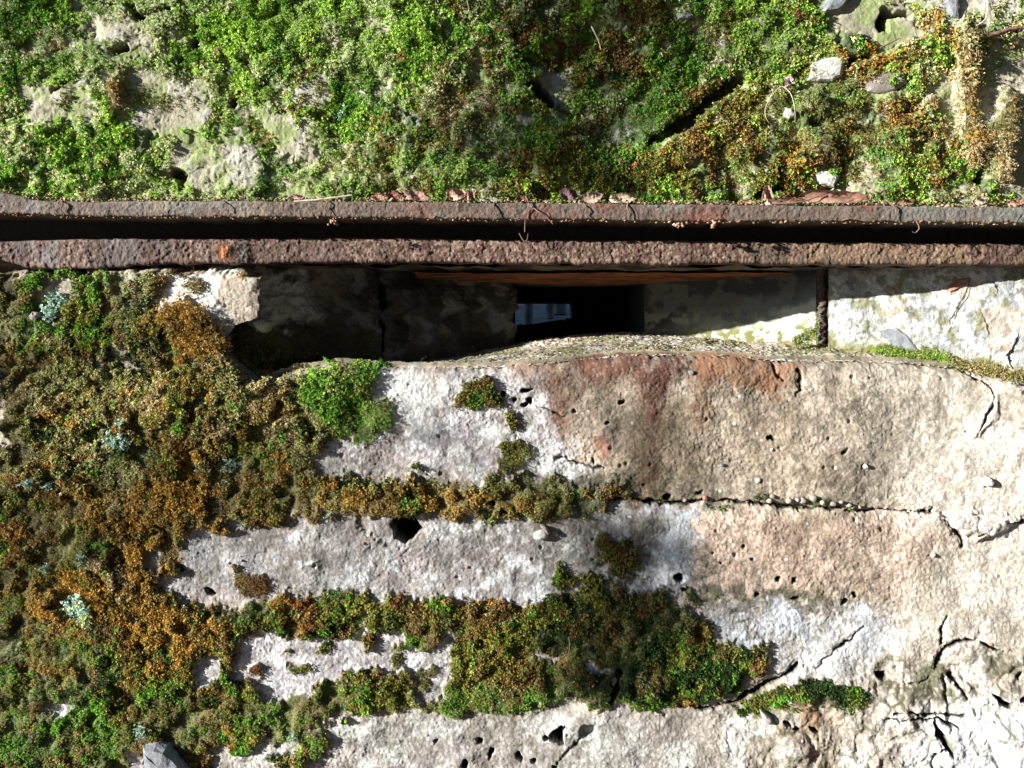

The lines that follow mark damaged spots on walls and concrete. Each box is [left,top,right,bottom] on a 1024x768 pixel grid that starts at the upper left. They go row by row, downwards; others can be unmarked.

corrosion [216,241,245,263]
corrosion [817,269,828,345]
corrosion [512,352,797,433]
crack [960,371,994,430]
crack [614,496,983,547]
crack [887,621,1003,755]